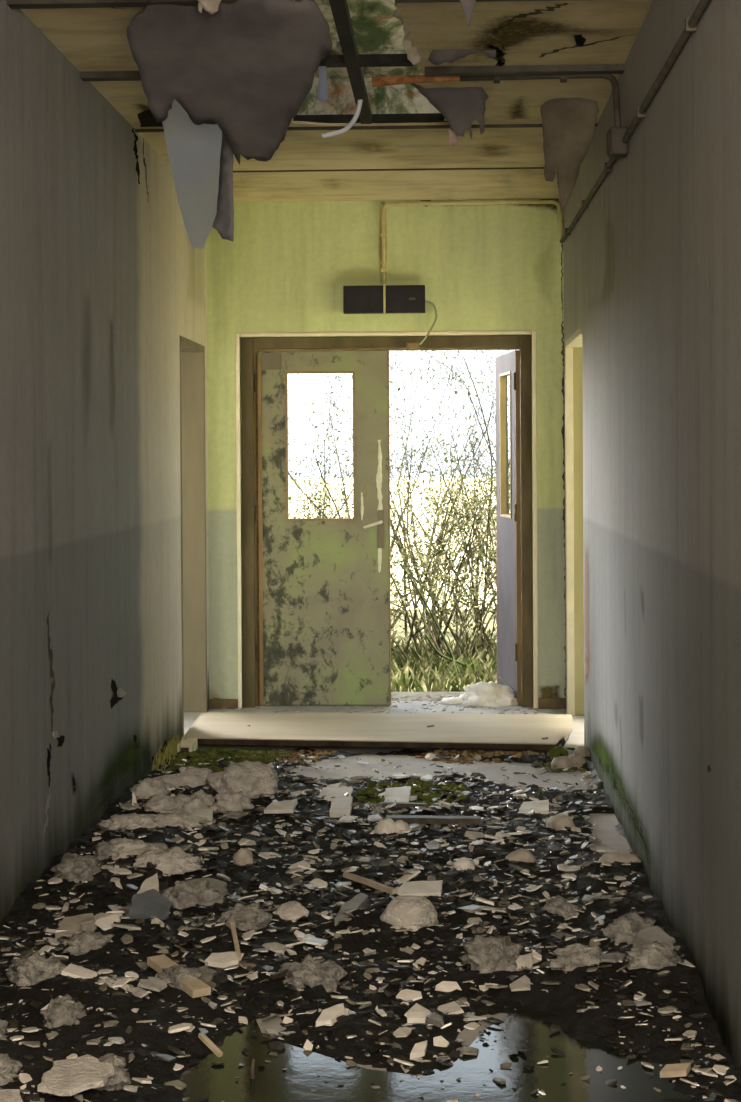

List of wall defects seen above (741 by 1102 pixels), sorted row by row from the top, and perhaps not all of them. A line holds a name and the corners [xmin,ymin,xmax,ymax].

crack [488,3,568,66]
crack [540,34,634,58]
spalling [137,104,163,127]
flaking render [110,679,127,709]
crack [43,611,55,840]